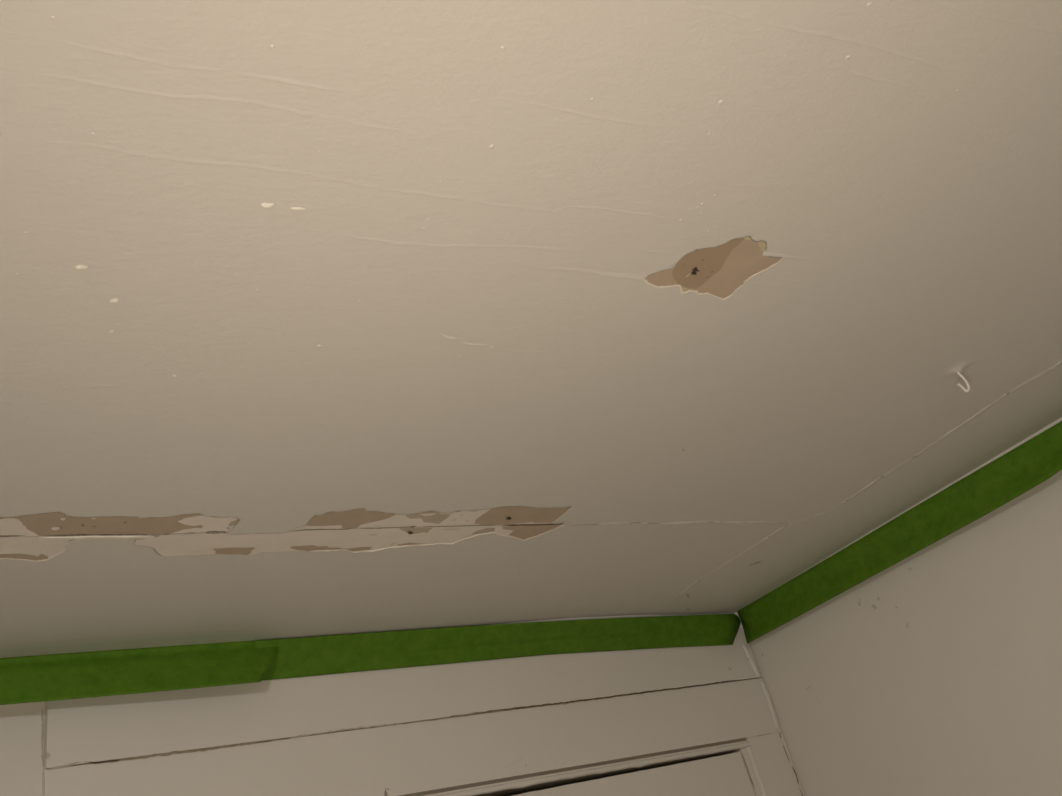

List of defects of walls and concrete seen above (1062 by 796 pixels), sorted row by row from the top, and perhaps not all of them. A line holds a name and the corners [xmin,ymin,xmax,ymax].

peeling [643,236,783,301]
peeling [0,506,572,562]